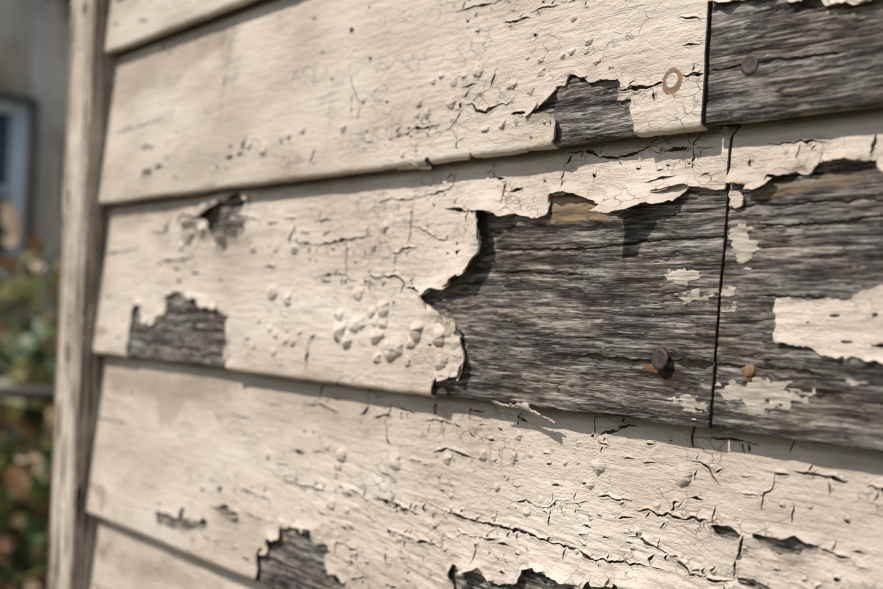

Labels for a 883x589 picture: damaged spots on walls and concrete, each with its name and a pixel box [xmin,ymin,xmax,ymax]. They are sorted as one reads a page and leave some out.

crack [455,0,596,30]
peeling [523,61,652,150]
crack [617,13,704,102]
rust [662,68,683,94]
peeling [706,0,883,125]
crack [558,133,715,190]
peeling [116,266,234,371]
peeling [416,143,883,451]
peeling [231,463,369,589]
crack [232,427,759,589]
peeling [443,539,669,589]
crack [759,440,883,524]